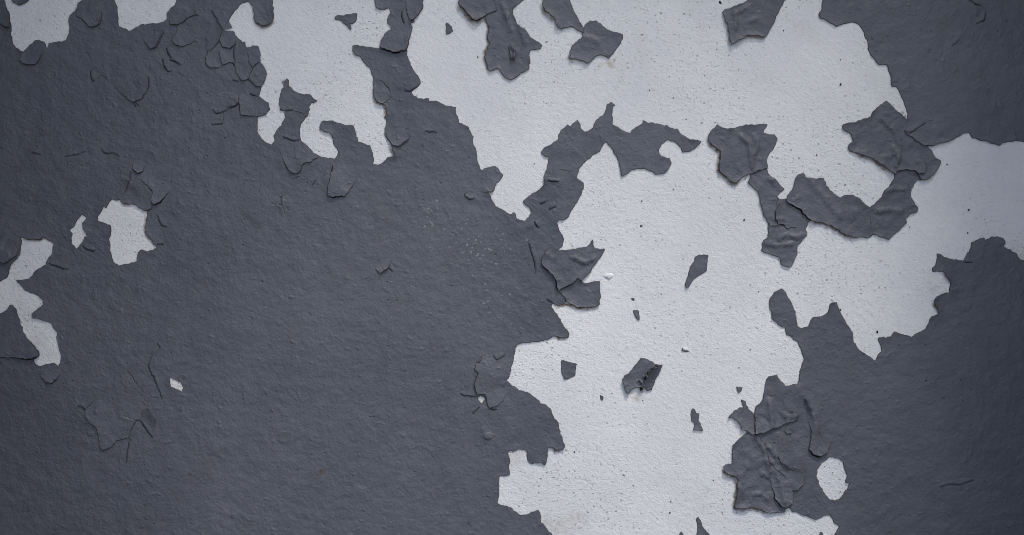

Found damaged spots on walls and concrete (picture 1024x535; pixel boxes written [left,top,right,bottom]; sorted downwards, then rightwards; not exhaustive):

peeling [0,0,102,65]
peeling [0,234,61,384]
peeling [70,160,171,265]
peeling [205,0,1024,535]
crack [78,342,164,463]
peeling [170,377,183,391]